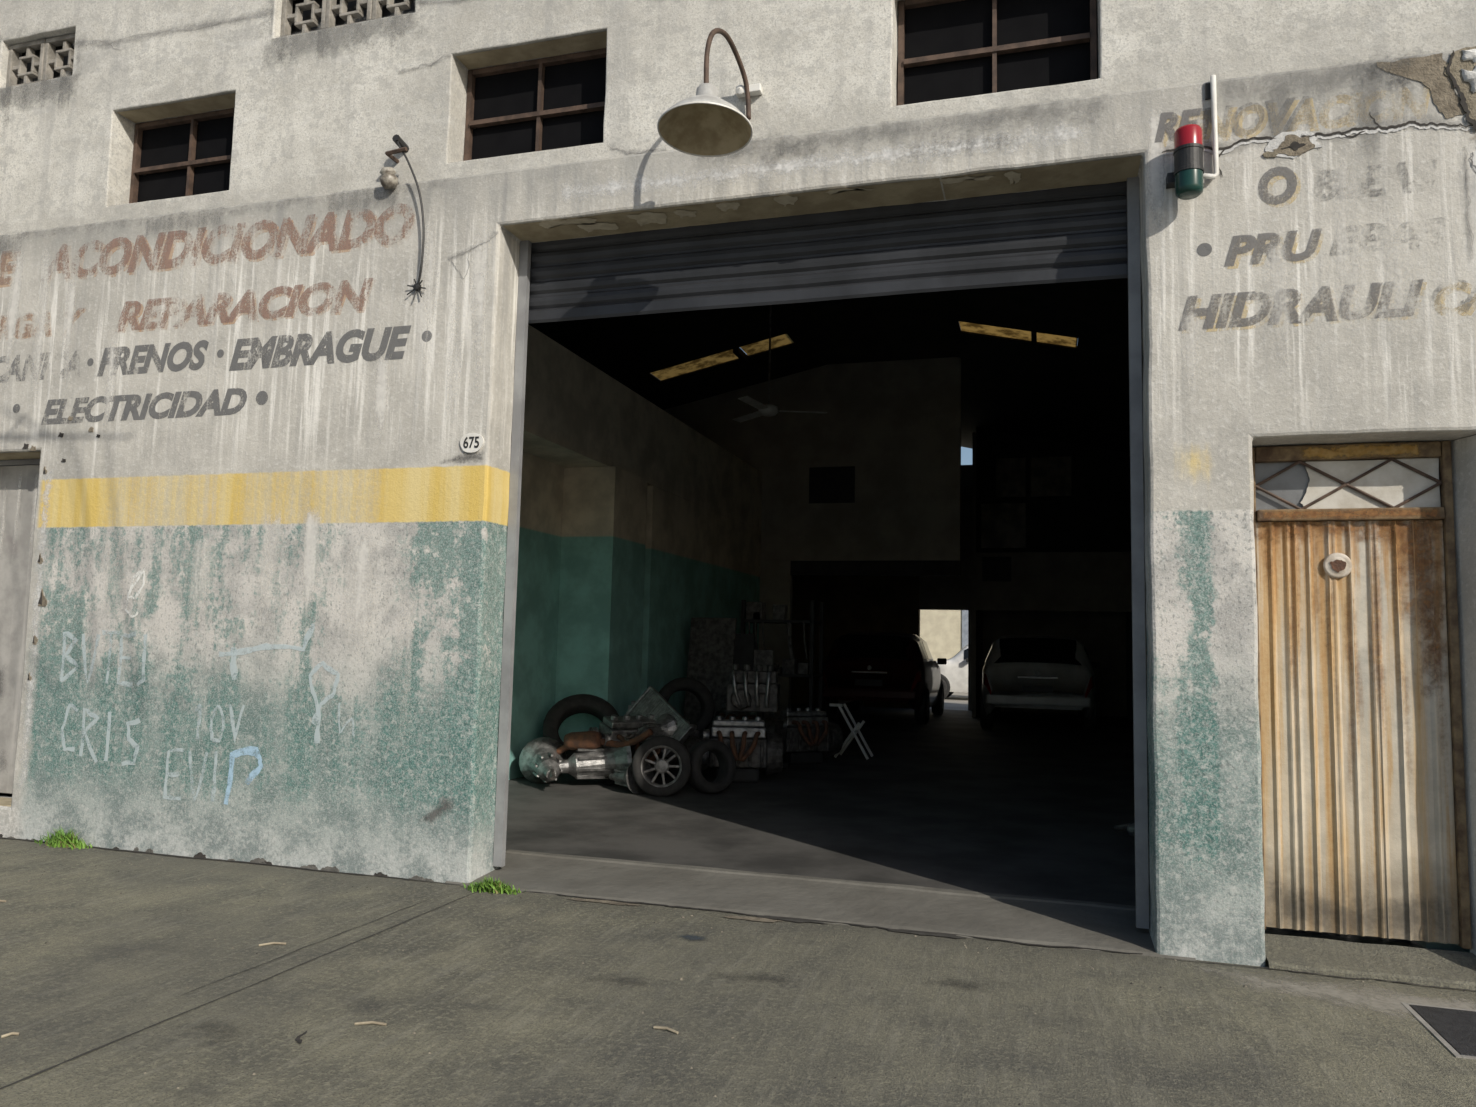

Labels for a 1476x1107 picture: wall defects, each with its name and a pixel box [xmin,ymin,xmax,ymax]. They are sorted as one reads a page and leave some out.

peeling [1373,46,1476,130]
crack [1162,115,1474,253]
spalling [22,458,66,779]
corrosion [1260,509,1444,698]